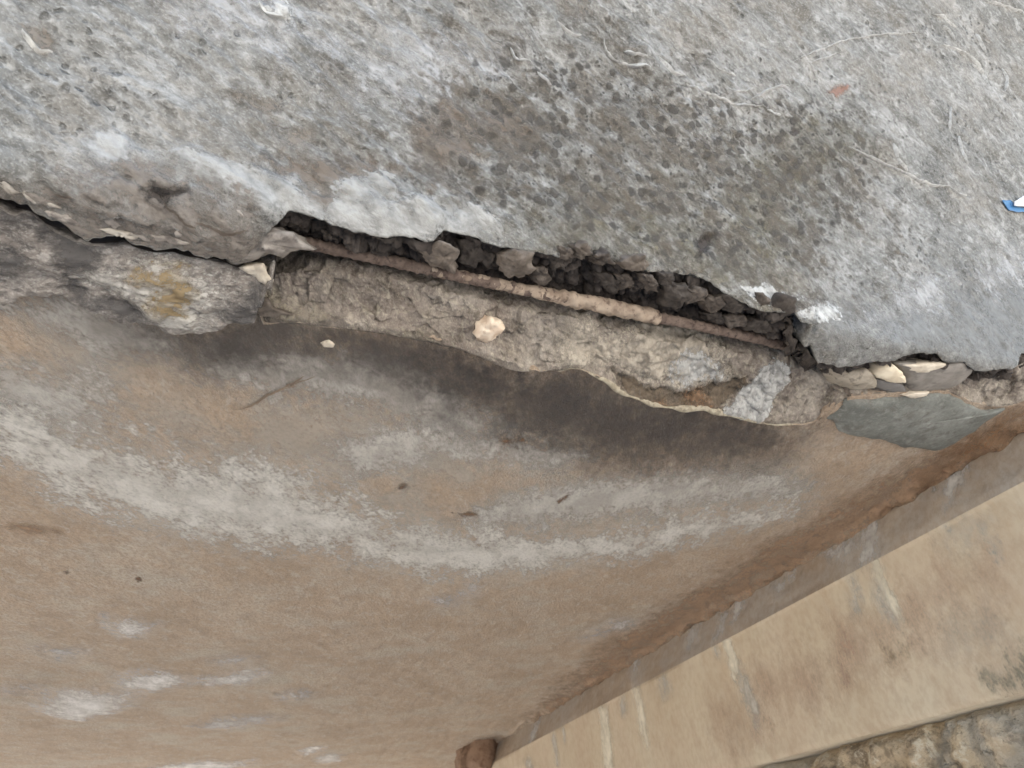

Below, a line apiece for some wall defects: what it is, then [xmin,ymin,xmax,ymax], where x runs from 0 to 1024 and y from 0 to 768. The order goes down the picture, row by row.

crack [0,194,277,280]
leakage [0,211,818,594]
spalling [238,55,950,426]
spalling [940,353,1024,407]
corrosion [536,409,1024,721]